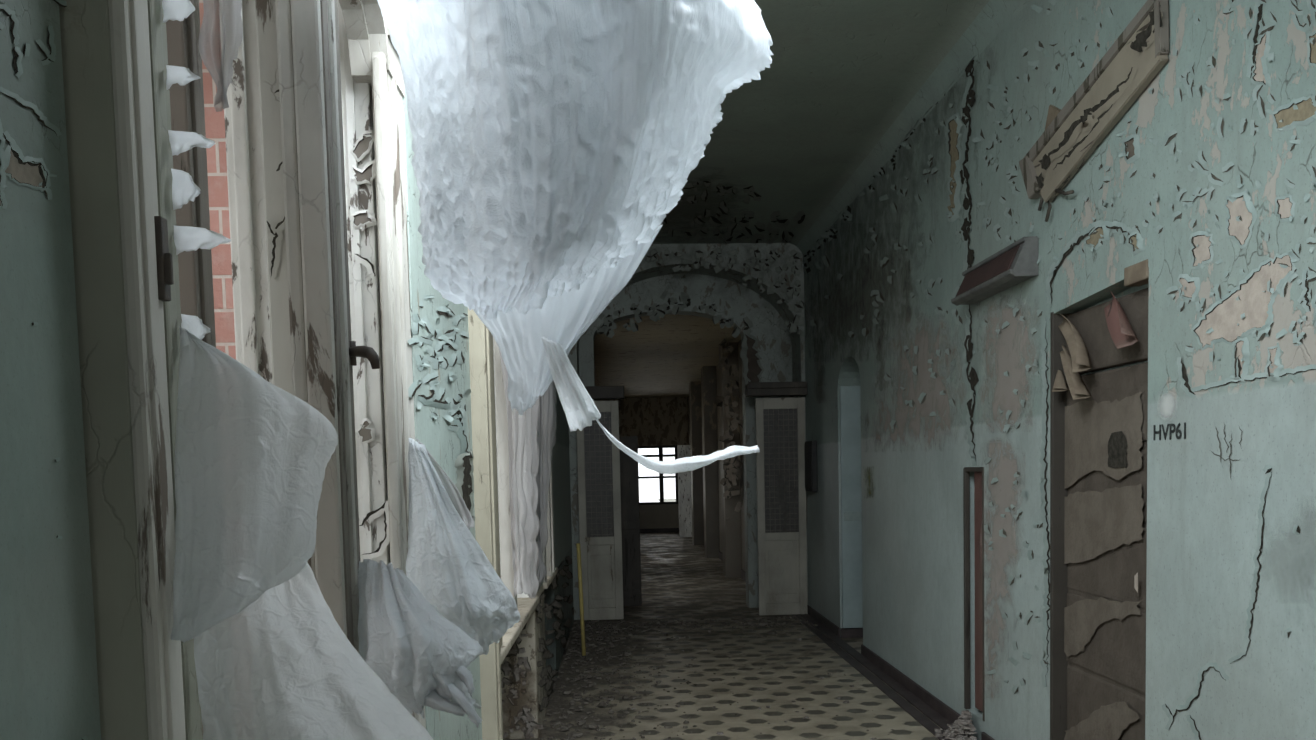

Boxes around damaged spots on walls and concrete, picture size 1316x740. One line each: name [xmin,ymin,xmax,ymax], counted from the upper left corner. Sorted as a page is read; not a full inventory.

peeling [23,25,56,66]
peeling [1173,0,1316,151]
peeling [0,143,57,208]
crack [959,60,979,466]
peeling [597,289,764,520]
peeling [984,456,1045,560]
crack [1161,465,1301,740]